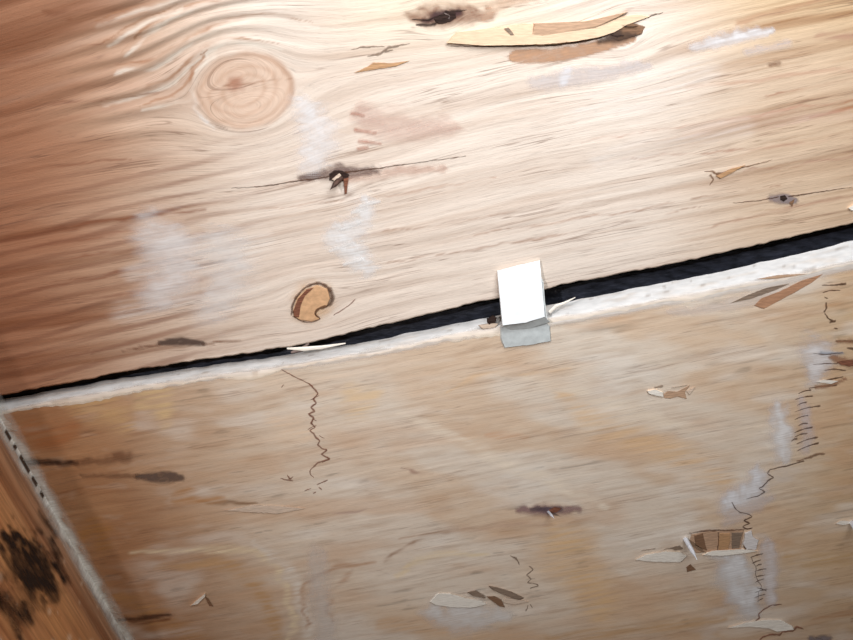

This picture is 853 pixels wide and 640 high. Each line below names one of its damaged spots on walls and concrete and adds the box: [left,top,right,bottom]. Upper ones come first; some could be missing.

peeling [532,12,626,36]
crack [281,369,330,493]
peeling [694,533,707,550]
crack [693,528,750,550]
peeling [718,532,743,550]
water stain [0,520,66,640]